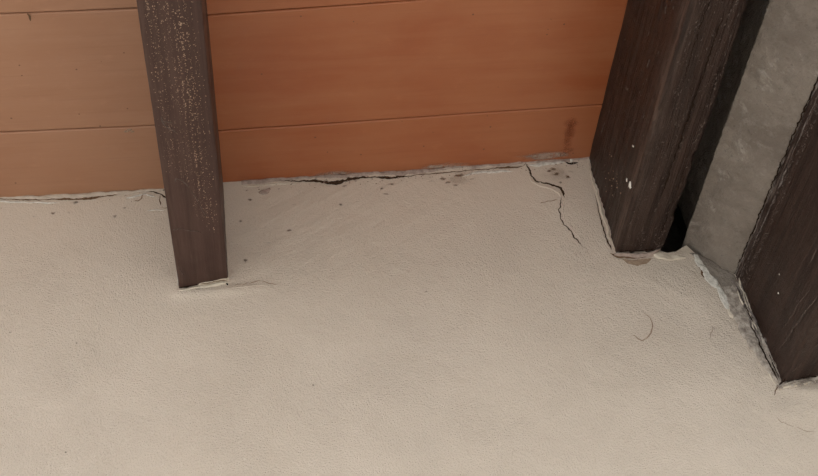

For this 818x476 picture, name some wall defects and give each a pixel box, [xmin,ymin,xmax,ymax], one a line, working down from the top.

crack [285,164,582,246]
spalling [241,77,818,390]